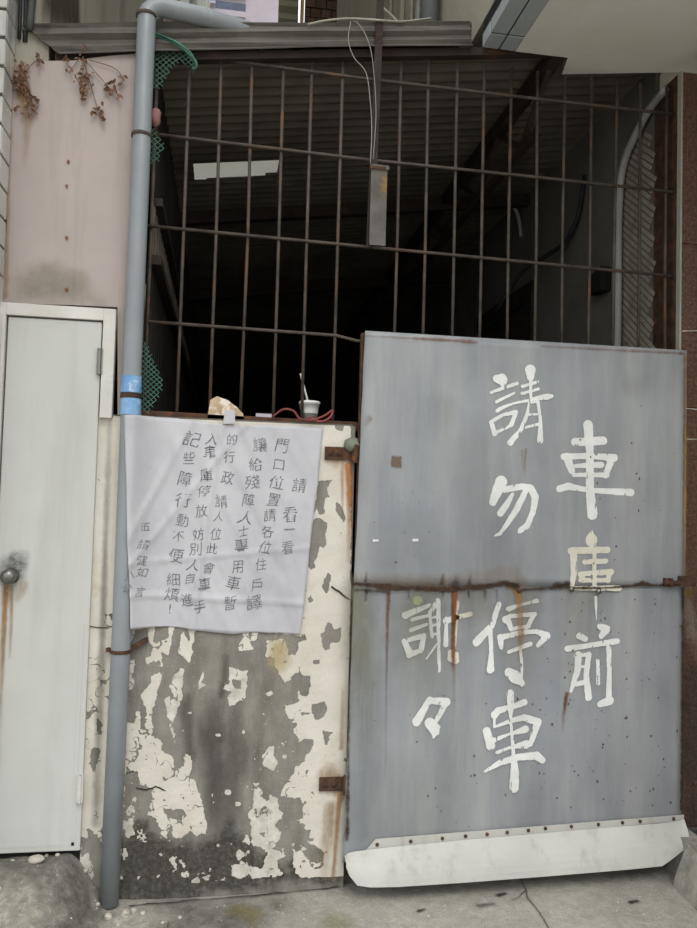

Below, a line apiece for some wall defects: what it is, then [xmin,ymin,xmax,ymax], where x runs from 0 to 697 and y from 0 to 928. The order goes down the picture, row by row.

corrosion [2,584,12,661]
peeling [85,657,110,771]
peeling [119,622,343,900]
corrosion [353,581,684,811]
peeling [80,828,102,890]
leakage [119,821,345,900]